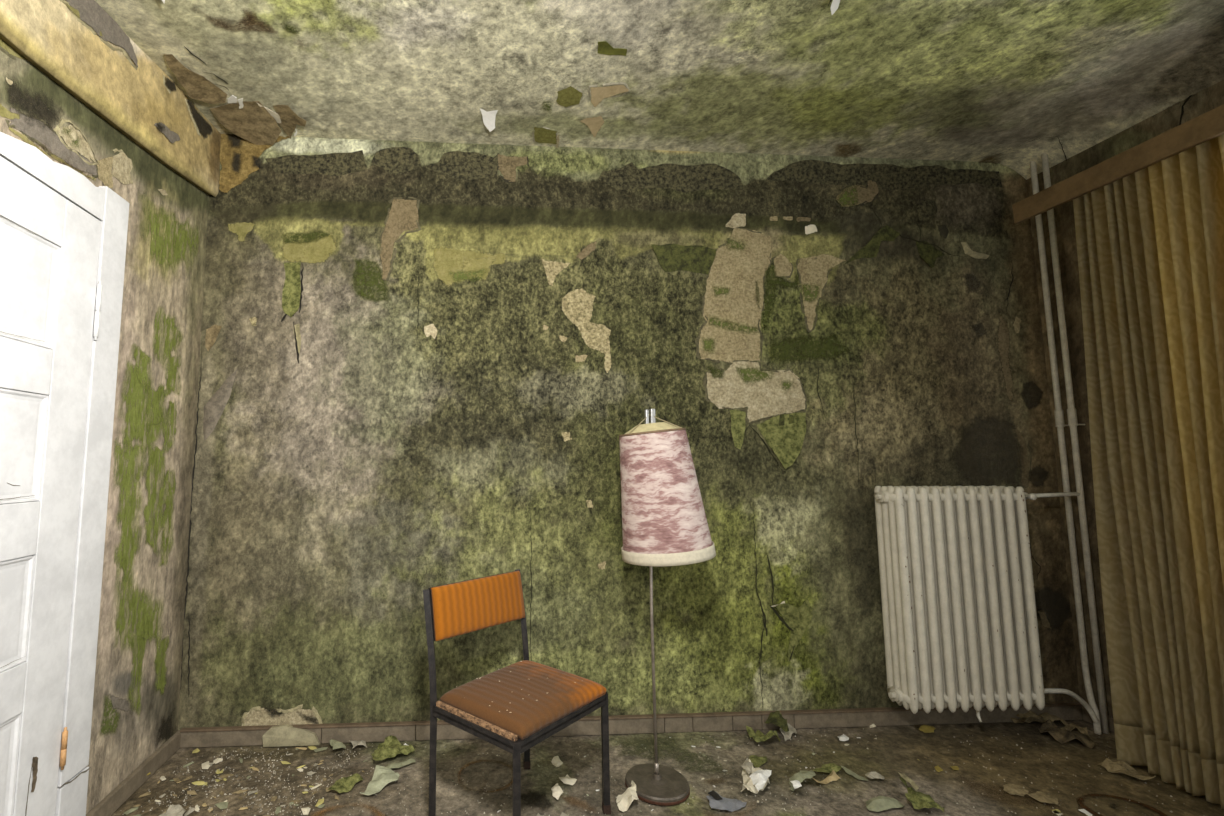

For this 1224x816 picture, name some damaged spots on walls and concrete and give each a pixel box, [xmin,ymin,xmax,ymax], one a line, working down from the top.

spalling [59,0,138,70]
water stain [208,12,298,34]
peeling [163,54,306,193]
water stain [836,144,859,157]
flaking render [378,197,421,281]
flaking render [542,242,596,286]
flaking render [543,288,611,373]
flaking render [651,213,846,469]
water stain [1022,381,1043,409]
water stain [952,415,1048,487]
water stain [1035,587,1072,629]